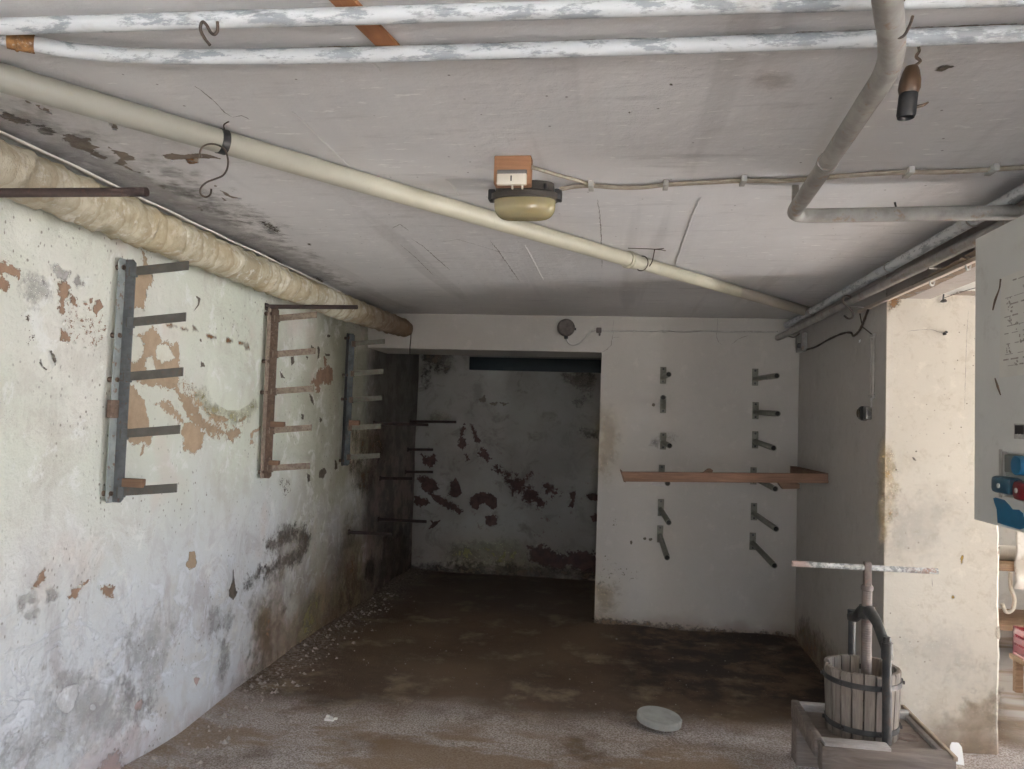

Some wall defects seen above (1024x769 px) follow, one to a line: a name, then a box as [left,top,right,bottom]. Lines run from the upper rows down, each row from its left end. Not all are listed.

peeling [0,100,149,173]
peeling [162,153,220,173]
peeling [0,259,22,292]
peeling [56,280,106,349]
peeling [128,326,261,456]
peeling [280,345,333,404]
peeling [414,453,498,526]
peeling [458,423,598,522]
peeling [31,569,46,590]
peeling [67,579,115,599]
leakage [244,524,311,589]